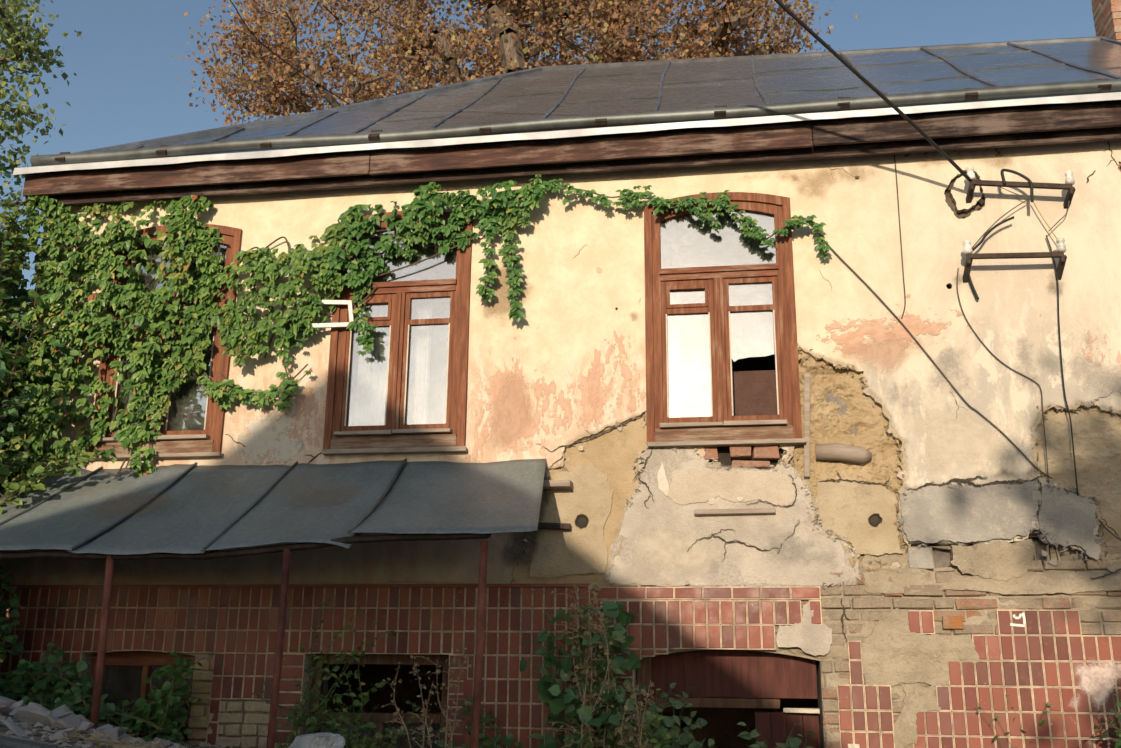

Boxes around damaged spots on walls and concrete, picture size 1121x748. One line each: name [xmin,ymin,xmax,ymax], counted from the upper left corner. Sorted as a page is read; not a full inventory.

crack [539,411,646,468]
crack [633,449,655,509]
spalling [465,308,968,594]
spalling [1030,399,1121,564]
peeling [1029,512,1059,572]
flaking render [942,616,964,630]